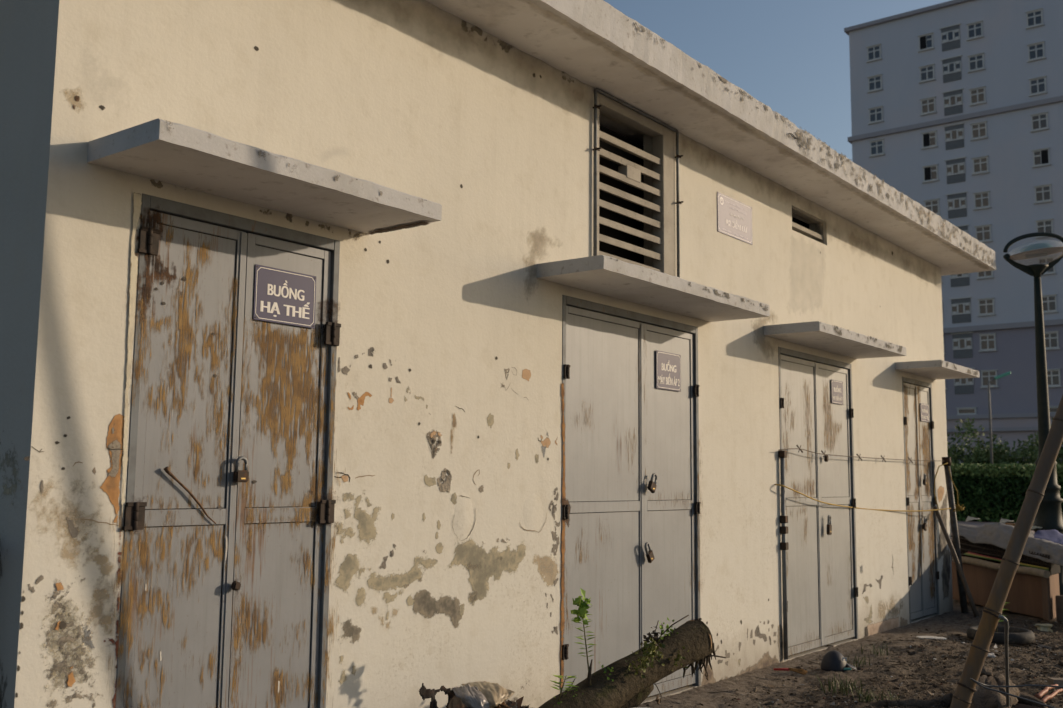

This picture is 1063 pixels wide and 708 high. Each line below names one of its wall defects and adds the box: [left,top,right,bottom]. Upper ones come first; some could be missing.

peeling [92,414,124,523]
rust [104,209,339,708]
peeling [549,488,560,555]
rust [783,382,842,540]
rust [904,382,938,598]
spalling [20,575,99,708]